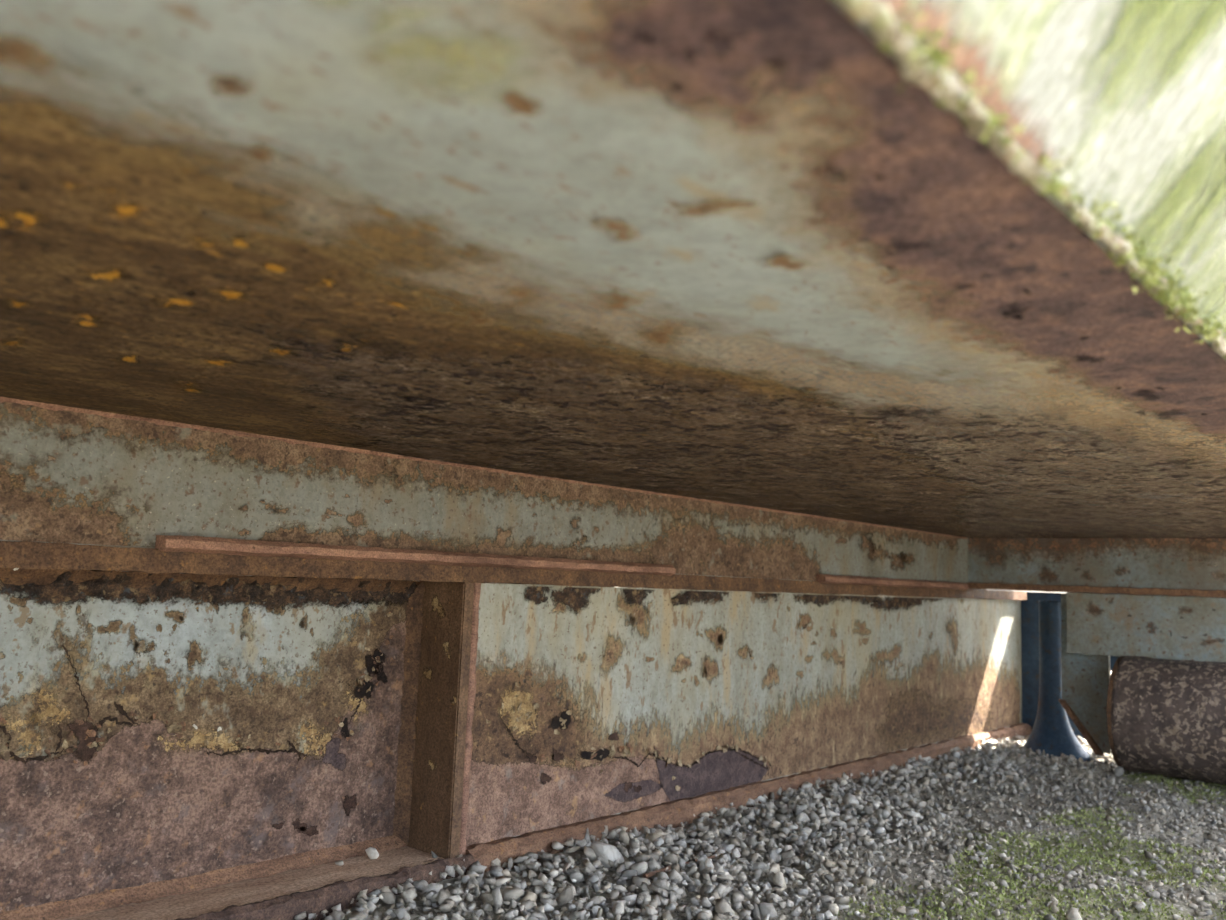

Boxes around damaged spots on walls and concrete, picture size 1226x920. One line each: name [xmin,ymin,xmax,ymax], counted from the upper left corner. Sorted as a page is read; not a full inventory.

rust [0,0,1226,583]
rust [53,621,77,674]
crack [0,638,138,764]
rust [187,641,203,667]
rust [0,571,418,653]
crack [348,673,371,724]
rust [471,586,1020,803]
peeling [0,598,407,913]
crack [199,741,311,764]
rust [322,738,346,771]